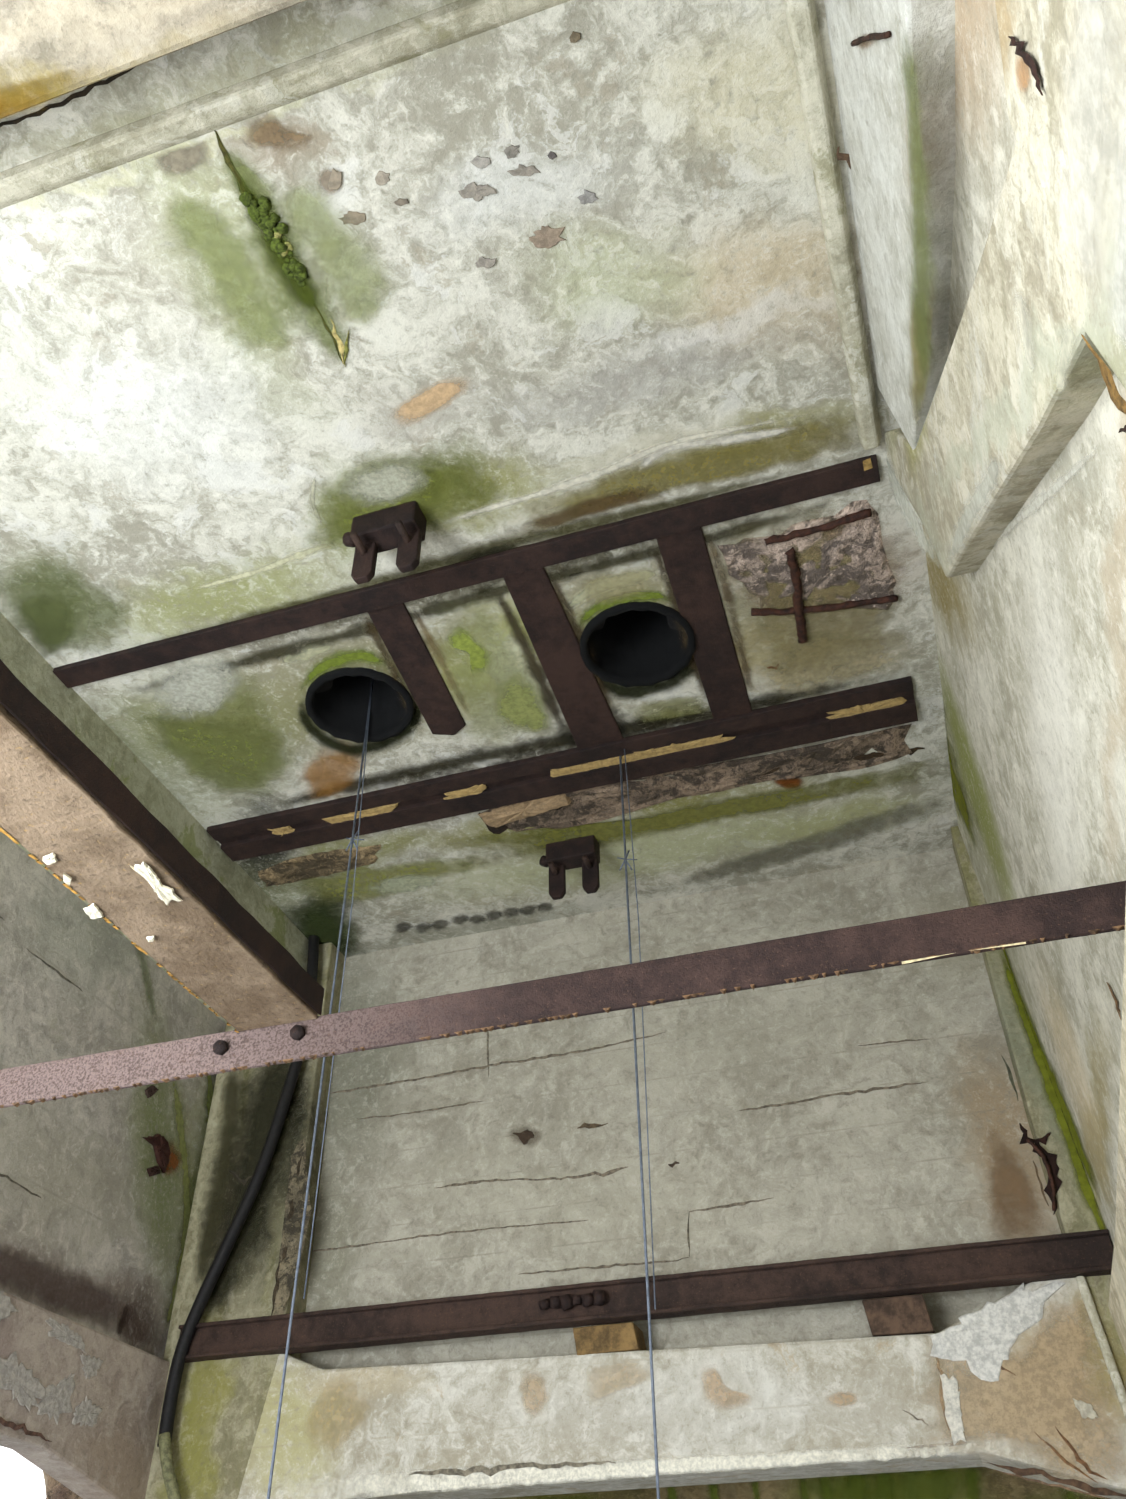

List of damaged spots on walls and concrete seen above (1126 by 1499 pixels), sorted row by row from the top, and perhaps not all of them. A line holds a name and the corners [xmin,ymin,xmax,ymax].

crack [0,67,135,127]
crack [177,130,374,365]
mould [18,577,118,651]
spalling [717,500,898,690]
crack [739,1081,928,1111]
damp [198,1063,303,1312]
crack [436,1166,628,1188]
crack [521,1198,771,1274]
peeling [0,1291,18,1321]
peeling [0,1317,103,1427]
peeling [347,1280,1116,1497]
crack [987,1462,1126,1499]